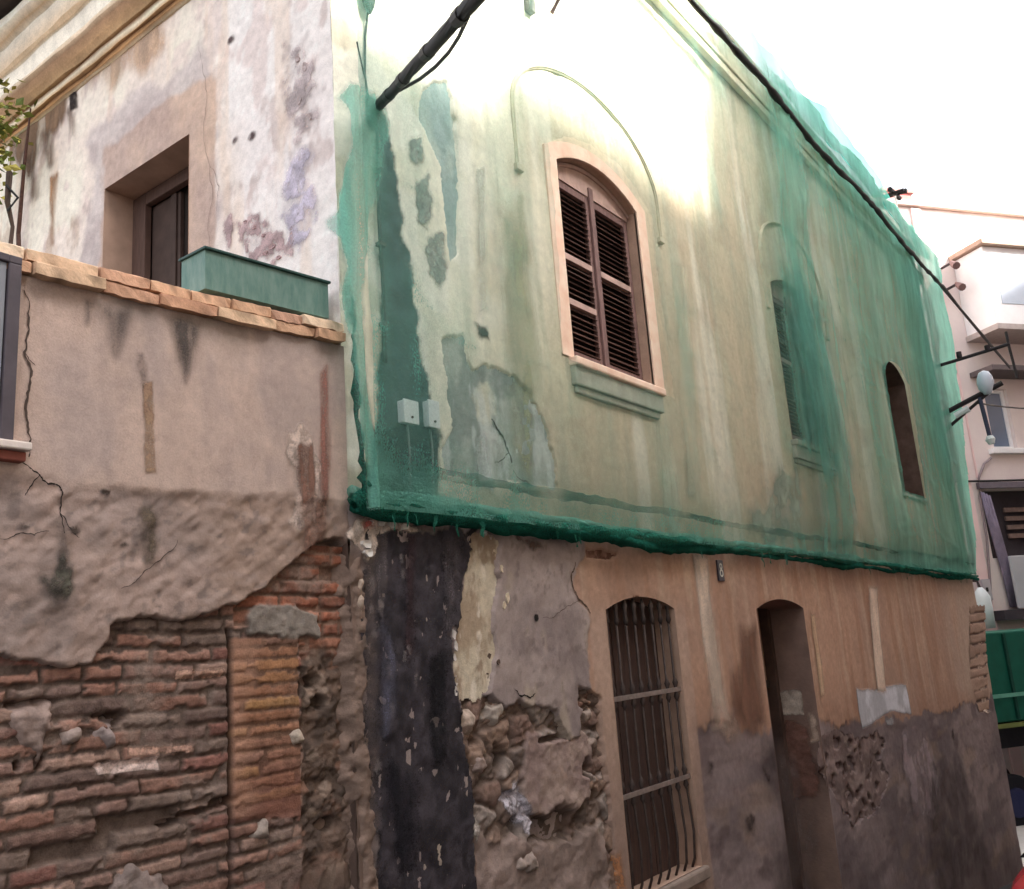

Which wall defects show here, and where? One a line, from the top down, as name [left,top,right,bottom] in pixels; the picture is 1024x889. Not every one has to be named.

peeling [223,43,318,265]
crack [4,290,78,540]
peeling [441,335,556,490]
spalling [0,423,418,889]
water stain [361,537,395,827]
spalling [452,530,617,889]
crack [543,562,591,618]
spalling [816,718,893,827]
water stain [903,735,987,889]
spalling [969,605,989,713]